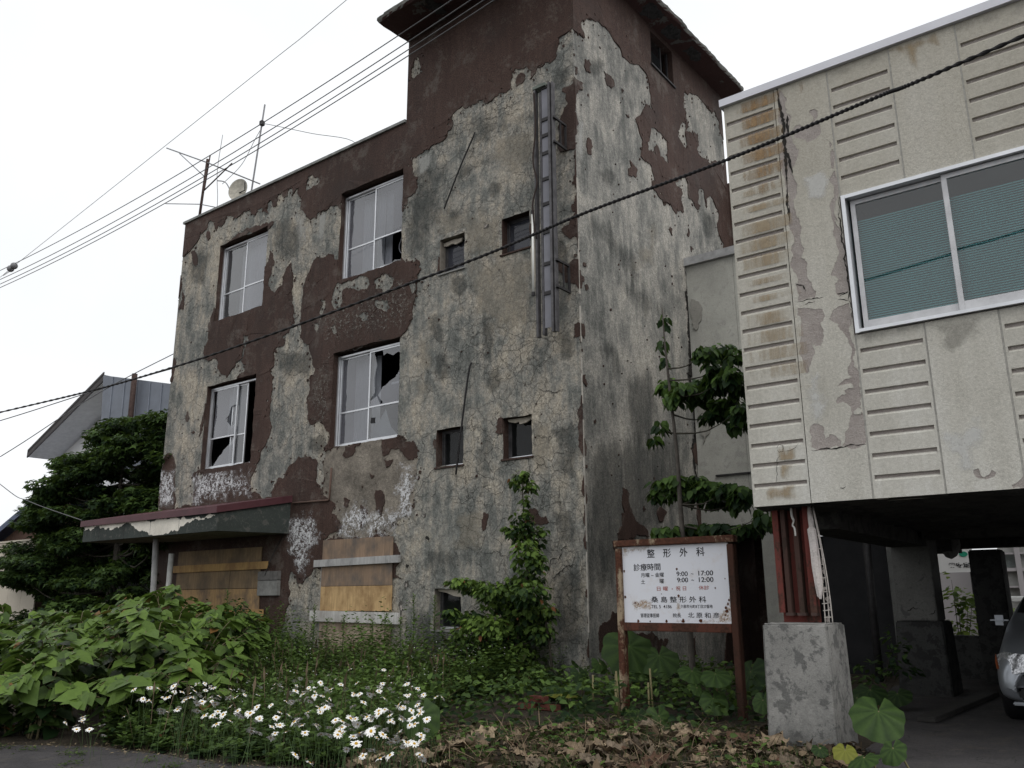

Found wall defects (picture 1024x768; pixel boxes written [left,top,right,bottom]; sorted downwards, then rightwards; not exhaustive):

rust [742,94,782,189]
crack [776,89,793,222]
peeling [777,91,866,450]
crack [797,196,853,316]
peeling [84,19,726,686]
efflorescence [193,470,247,505]
efflorescence [287,518,318,571]
efflorescence [339,466,413,537]